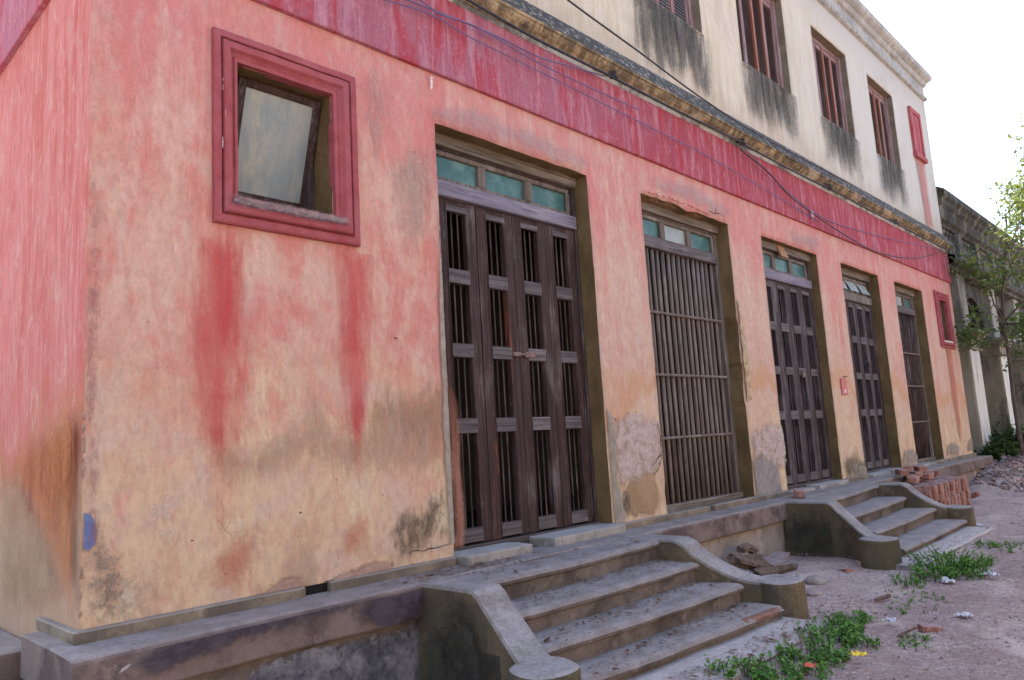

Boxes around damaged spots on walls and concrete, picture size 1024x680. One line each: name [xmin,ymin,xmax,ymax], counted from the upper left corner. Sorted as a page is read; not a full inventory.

water stain [635,0,711,95]
water stain [744,63,801,140]
water stain [822,116,864,178]
water stain [879,154,908,208]
flaking render [615,411,663,486]
flaking render [750,422,787,470]
water stain [395,497,443,558]